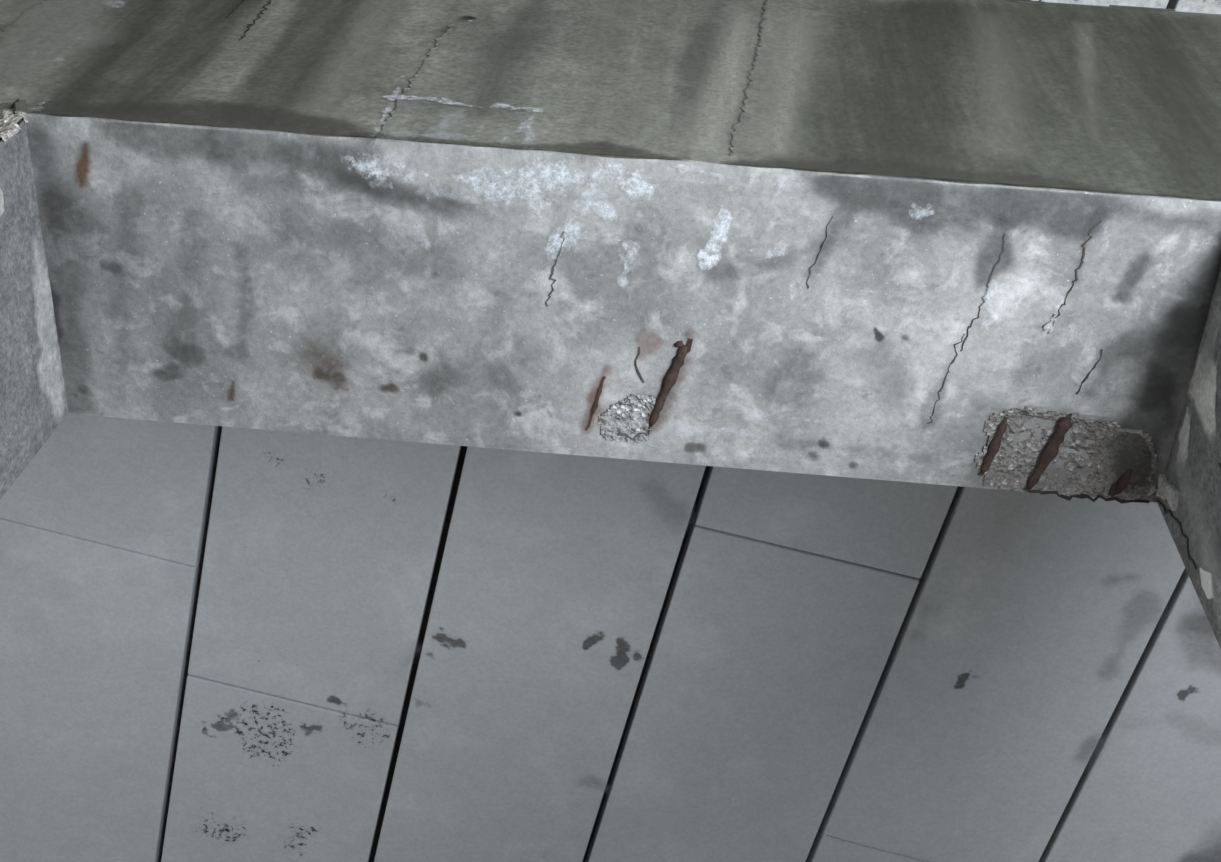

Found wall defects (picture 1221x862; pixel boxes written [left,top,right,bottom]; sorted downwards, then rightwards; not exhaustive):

spalling [0,99,29,143]
leakage [30,0,465,139]
leakage [415,103,682,218]
leakage [729,3,1221,283]
spalling [585,338,693,443]
crack [807,217,833,289]
crack [927,234,1005,424]
crack [1042,218,1102,334]
crack [1076,349,1103,395]
leakage [1118,272,1213,490]
peeling [1177,297,1221,465]
spalling [974,406,1215,600]